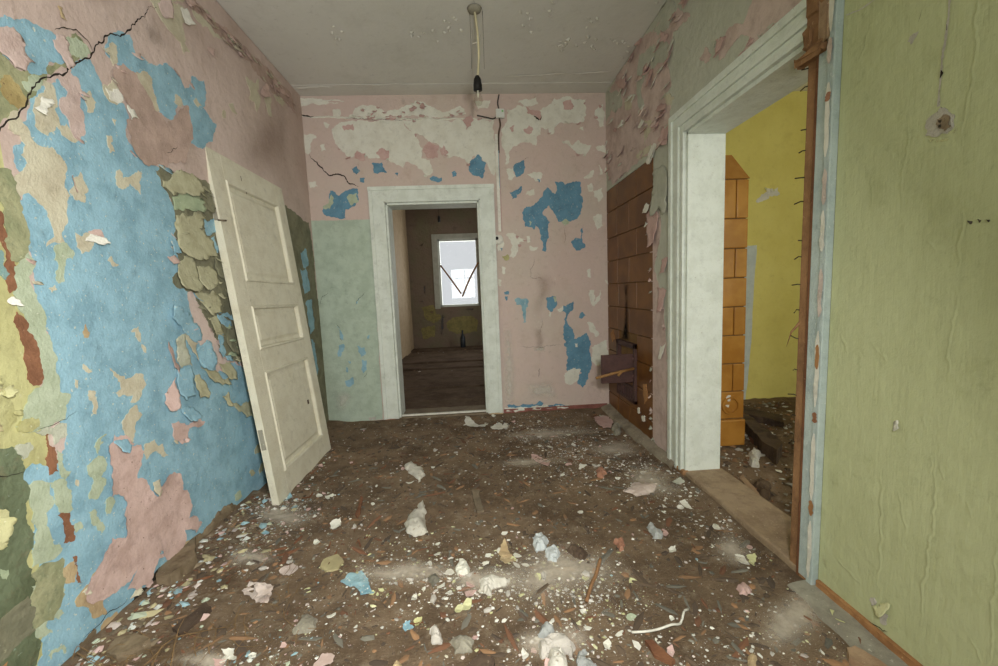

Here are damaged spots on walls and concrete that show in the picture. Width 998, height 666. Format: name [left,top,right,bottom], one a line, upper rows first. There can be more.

peeling [713,0,802,60]
peeling [827,0,835,64]
crack [0,6,157,131]
peeling [823,82,831,157]
spalling [925,107,955,142]
peeling [150,0,690,451]
peeling [0,15,267,666]
peeling [806,331,820,577]
peeling [499,538,514,563]
peeling [735,553,757,566]
peeling [403,617,422,631]
peeling [313,653,335,666]